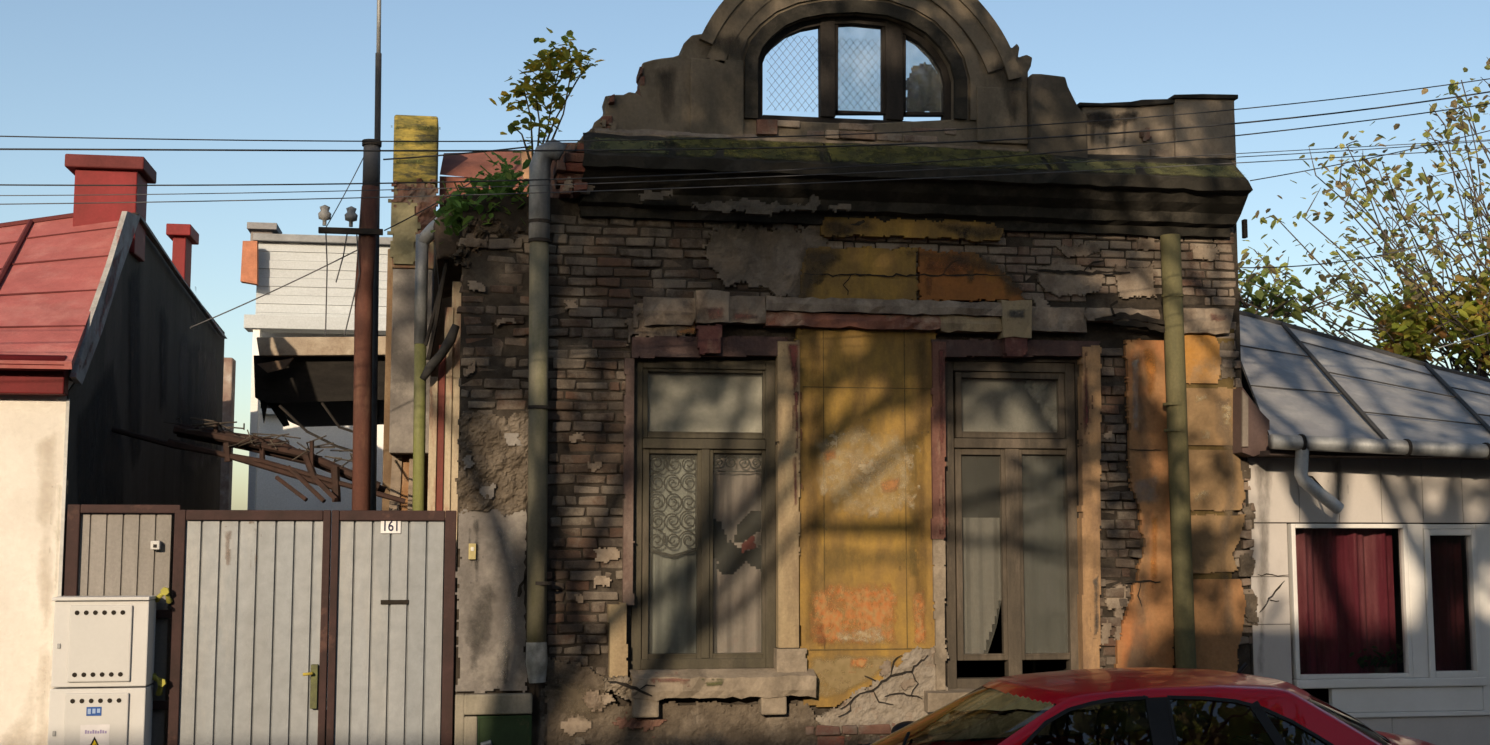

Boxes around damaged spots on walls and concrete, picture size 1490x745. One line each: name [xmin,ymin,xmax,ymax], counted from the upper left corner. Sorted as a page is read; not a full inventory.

spalling [635,67,645,95]
spalling [455,233,529,516]
spalling [547,94,851,745]
peeling [821,430,920,516]
spalling [826,232,1162,318]
spalling [1079,348,1142,668]
spalling [1181,224,1242,388]
spalling [1232,456,1259,645]
crack [838,655,928,717]